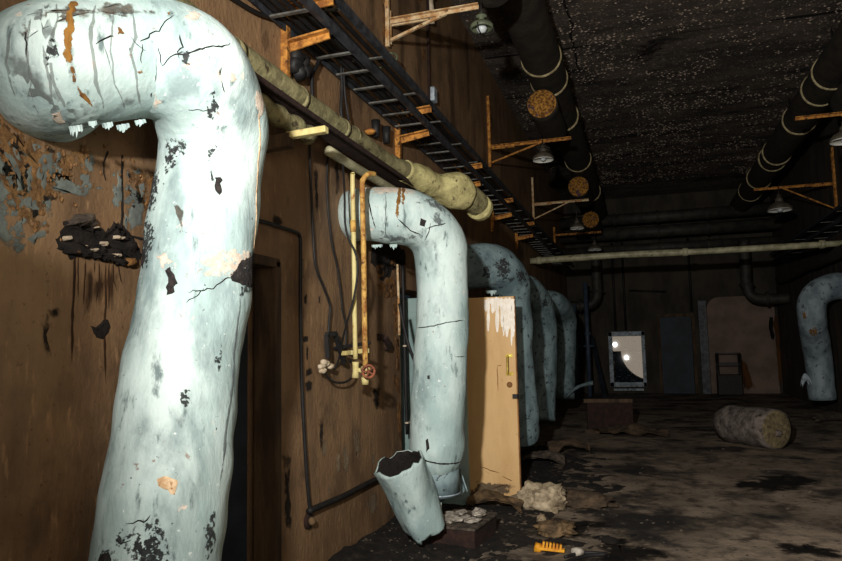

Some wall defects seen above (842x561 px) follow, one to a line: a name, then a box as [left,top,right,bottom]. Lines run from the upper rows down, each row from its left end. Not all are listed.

rust [63,1,93,107]
crack [96,16,230,96]
peeling [0,114,154,267]
rust [395,188,406,218]
crack [186,277,232,303]
peeling [200,249,251,276]